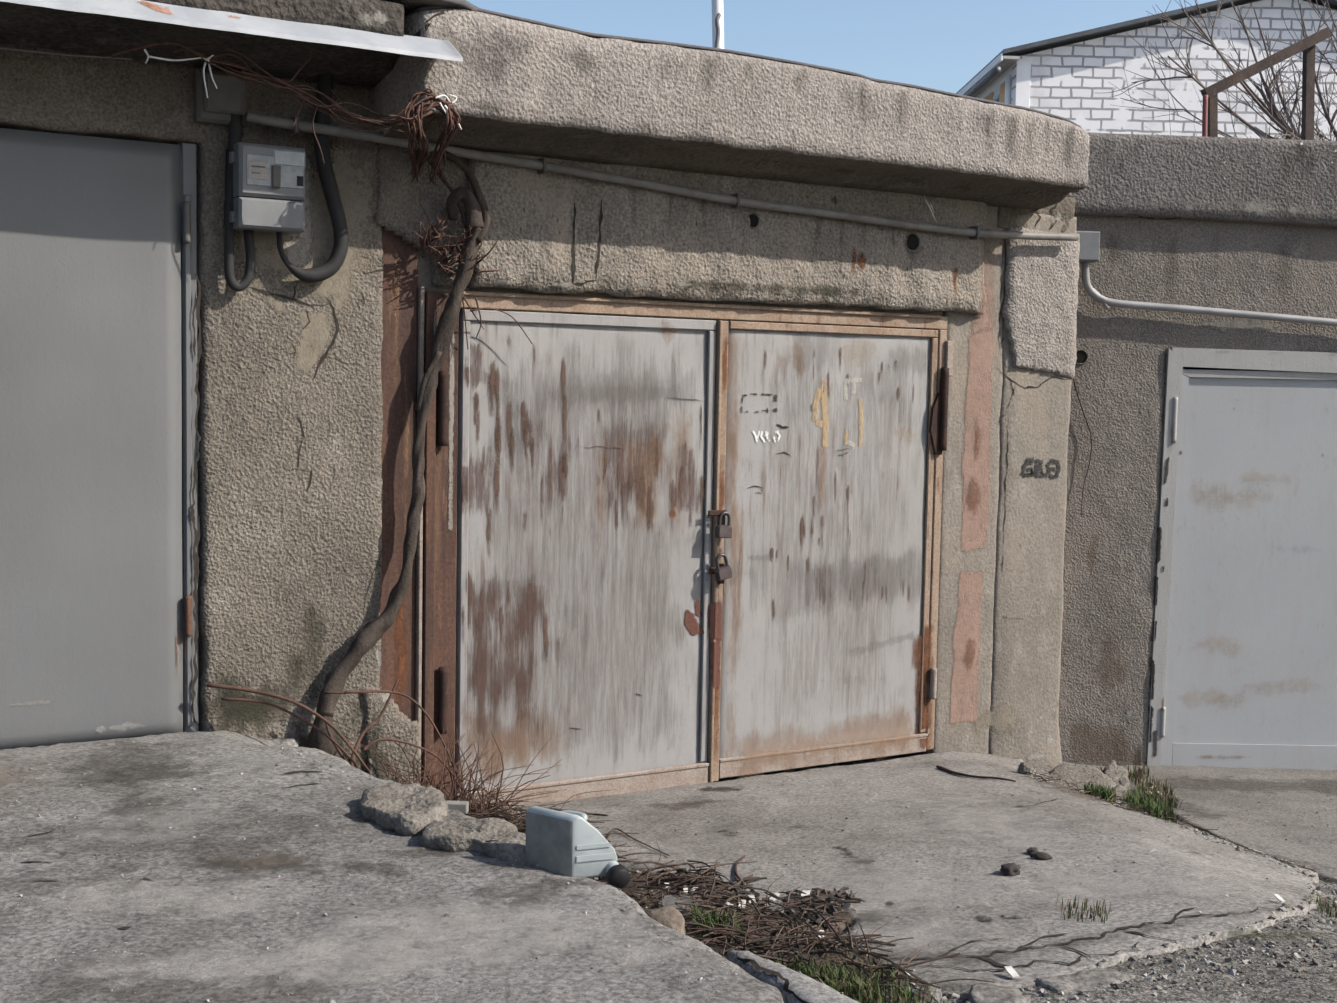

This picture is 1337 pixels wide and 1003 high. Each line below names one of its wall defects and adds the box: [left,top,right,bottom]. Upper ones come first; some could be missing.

corrosion [138,1,172,14]
crack [571,200,603,285]
spalling [997,197,1075,233]
crack [247,281,365,381]
corrosion [466,359,579,554]
corrosion [598,410,659,529]
corrosion [670,444,725,523]
corrosion [800,455,831,599]
corrosion [461,574,472,637]
corrosion [912,626,933,748]
crack [1095,797,1337,884]
crack [861,907,1264,971]